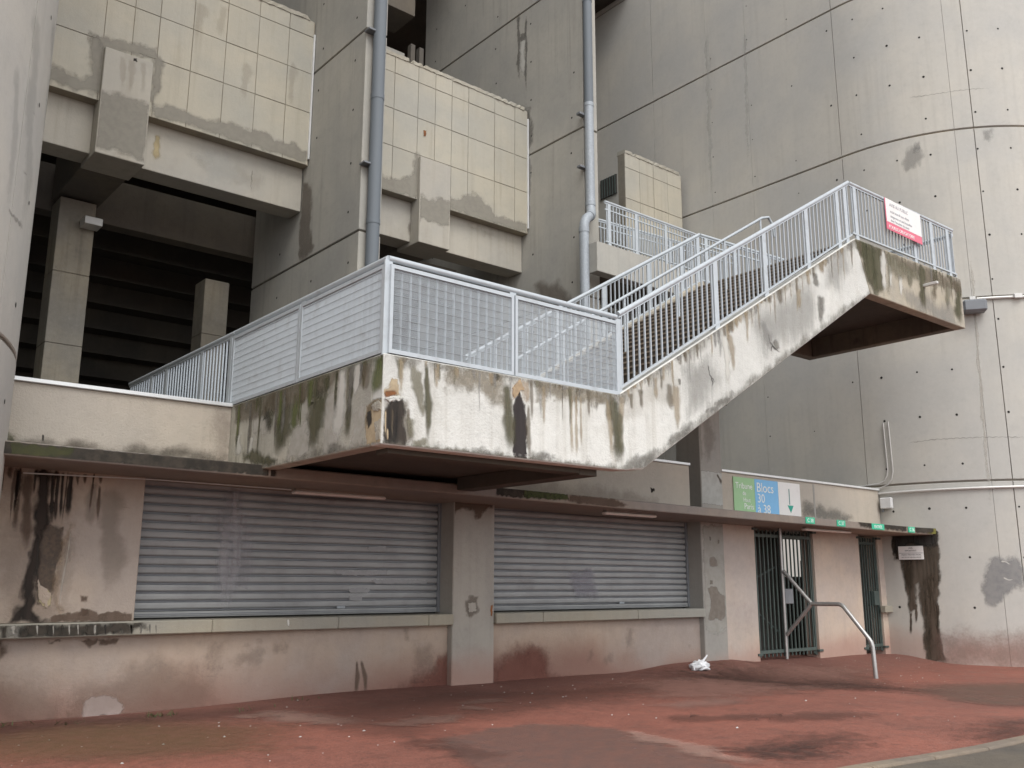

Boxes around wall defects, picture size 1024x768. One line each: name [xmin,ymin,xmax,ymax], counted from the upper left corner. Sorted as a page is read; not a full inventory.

spalling [365,378,410,445]
water stain [392,357,739,469]
water stain [764,240,987,453]
water stain [2,468,151,647]
water stain [892,531,946,662]